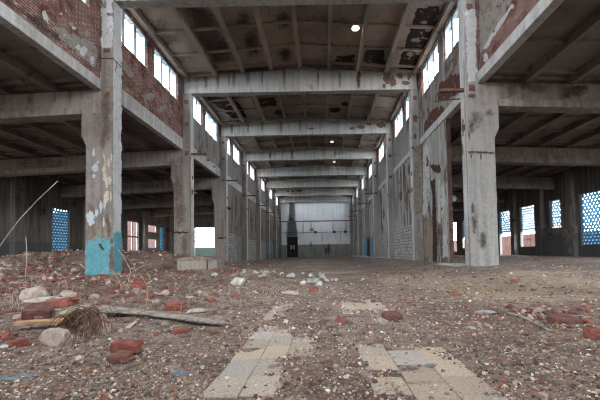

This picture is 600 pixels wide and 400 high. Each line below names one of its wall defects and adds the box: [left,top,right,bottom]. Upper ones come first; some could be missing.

peeling [382,6,439,88]
flaking render [424,0,515,133]
peeling [42,0,134,275]
peeling [406,143,449,262]
leakage [471,202,486,247]